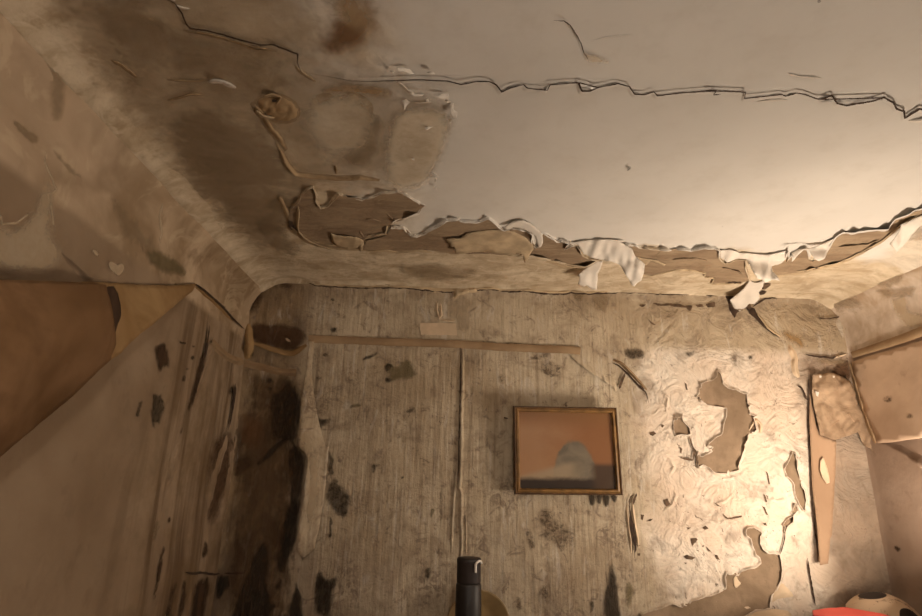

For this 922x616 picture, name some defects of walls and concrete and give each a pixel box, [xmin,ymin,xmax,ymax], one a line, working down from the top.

crack [168,0,922,123]
leakage [388,110,446,187]
leakage [0,162,57,267]
peeling [286,186,922,318]
peeling [0,280,196,457]
mould [152,395,164,425]
mould [155,344,169,370]
peeling [613,359,649,402]
peeling [672,368,763,476]
leakage [166,378,302,616]
peeling [638,397,836,616]
leakage [315,573,335,616]